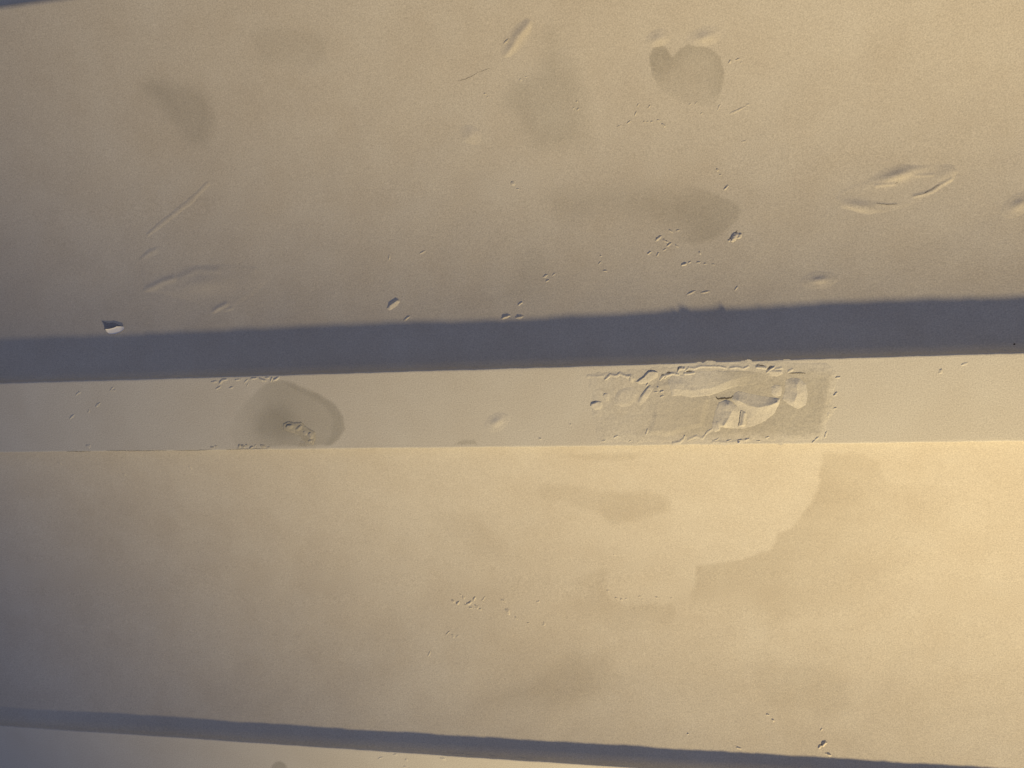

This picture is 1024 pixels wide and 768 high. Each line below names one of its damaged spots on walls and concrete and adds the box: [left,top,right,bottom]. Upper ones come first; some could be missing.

peeling [103,322,124,334]
flaking render [586,359,841,446]